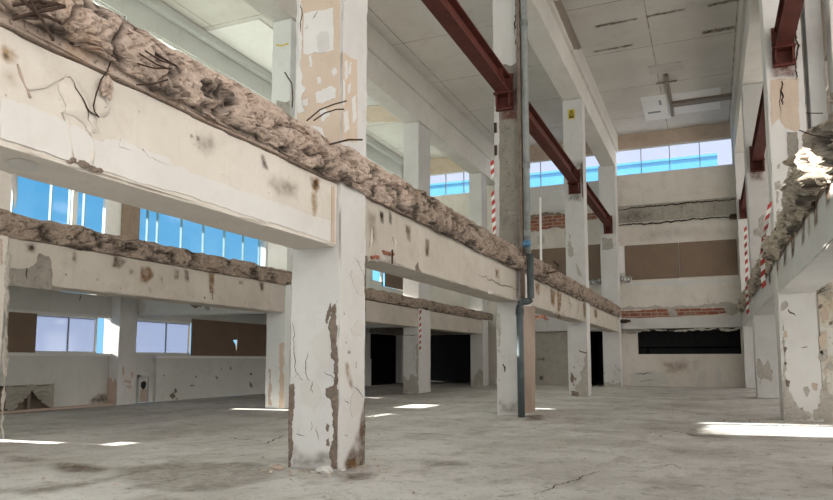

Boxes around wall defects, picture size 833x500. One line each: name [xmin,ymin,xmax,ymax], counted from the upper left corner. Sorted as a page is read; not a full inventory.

crack [779,27,800,117]
spalling [0,0,833,318]
crack [618,198,736,226]
spalling [0,173,292,439]
peeling [268,301,338,469]
crack [292,324,363,403]
spalling [350,249,501,353]
peeling [757,302,833,421]